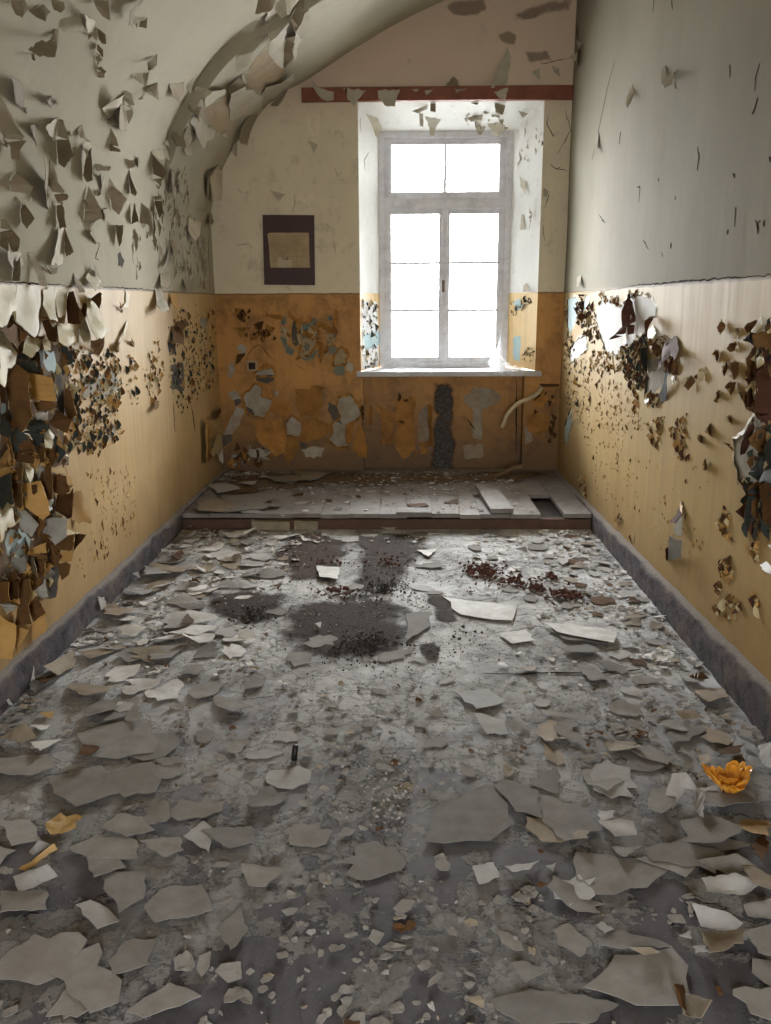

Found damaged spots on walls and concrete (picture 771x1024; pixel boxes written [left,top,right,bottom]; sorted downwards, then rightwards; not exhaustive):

peeling [0,0,541,659]
peeling [524,289,710,565]
peeling [711,317,771,620]